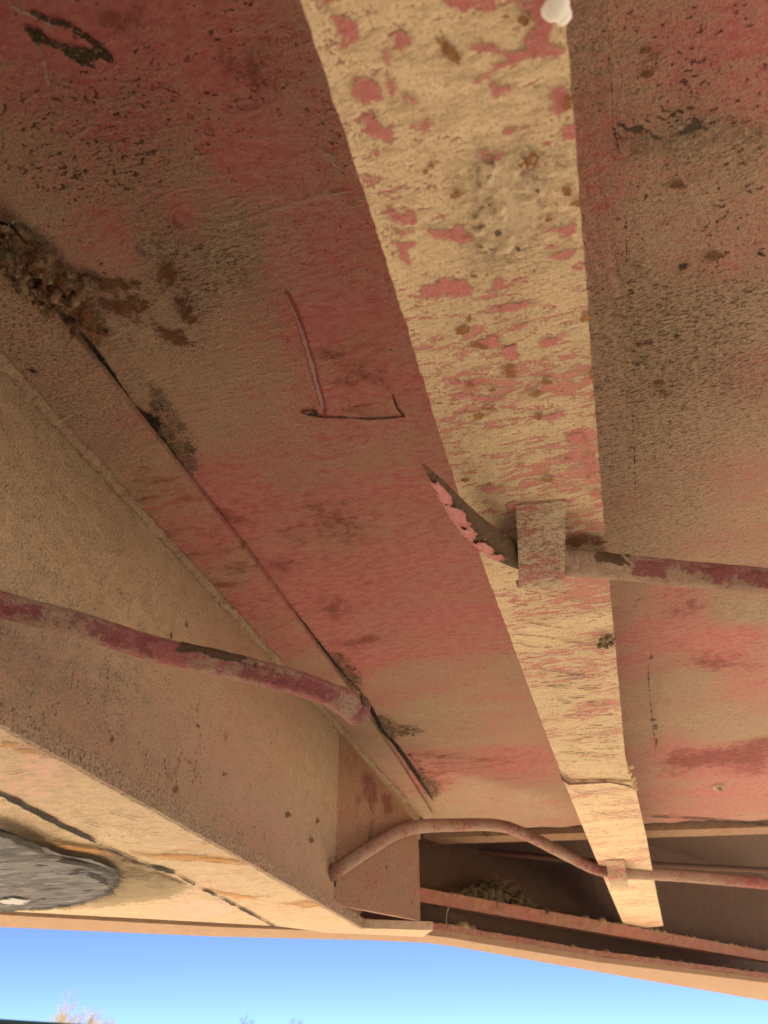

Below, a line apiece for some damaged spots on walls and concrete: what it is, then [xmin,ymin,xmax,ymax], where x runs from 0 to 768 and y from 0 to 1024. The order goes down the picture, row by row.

peeling [332,15,360,50]
peeling [346,31,422,161]
peeling [443,0,565,100]
peeling [548,85,580,143]
crack [607,18,621,161]
peeling [385,205,504,301]
peeling [543,218,577,261]
spalling [284,287,327,416]
peeling [426,471,519,569]
crack [512,590,766,826]